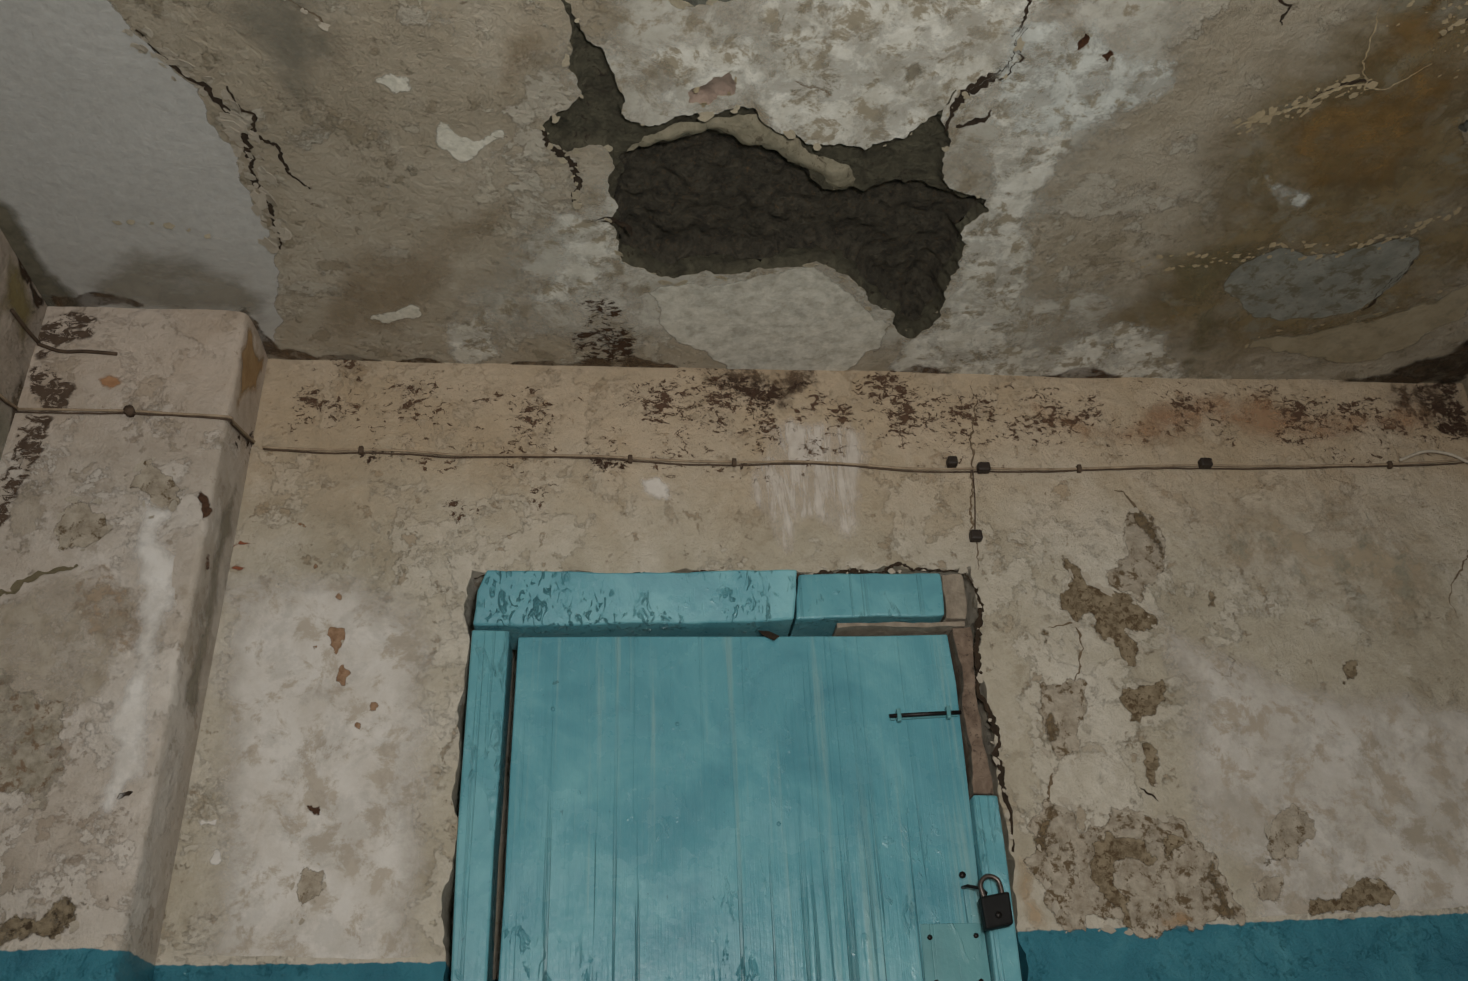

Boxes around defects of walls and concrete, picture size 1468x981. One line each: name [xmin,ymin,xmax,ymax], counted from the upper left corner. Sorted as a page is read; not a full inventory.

peeling [1232,0,1468,135]
spalling [542,0,989,339]
leakage [0,0,1468,547]
peeling [1124,207,1468,363]
crack [0,564,78,596]
crack [1448,550,1468,612]
peeling [1024,490,1317,939]
peeling [1339,660,1361,684]
peeling [0,890,89,950]
peeling [1303,874,1400,919]